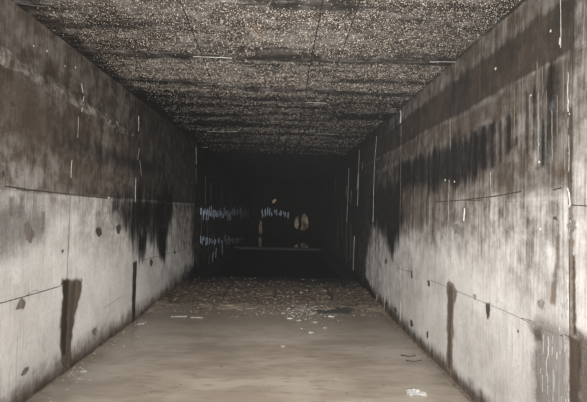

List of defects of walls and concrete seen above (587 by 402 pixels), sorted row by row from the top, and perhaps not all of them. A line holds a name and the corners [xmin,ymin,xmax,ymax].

water stain [490,93,517,191]
water stain [522,60,570,172]
water stain [149,224,168,261]
water stain [60,279,82,370]
water stain [446,282,457,375]